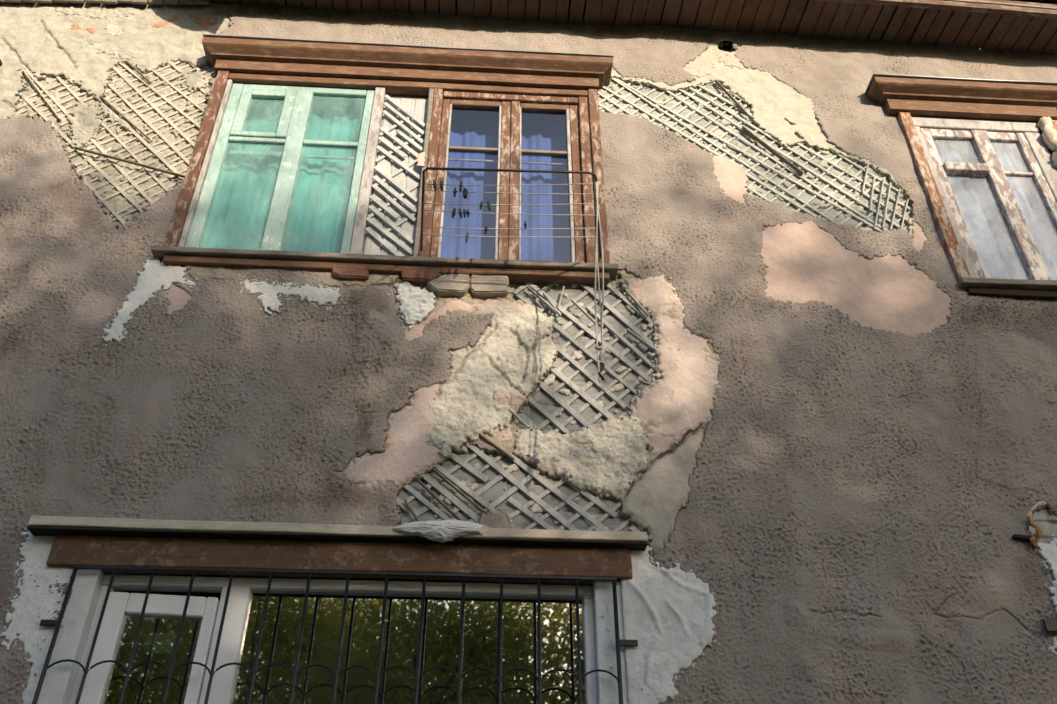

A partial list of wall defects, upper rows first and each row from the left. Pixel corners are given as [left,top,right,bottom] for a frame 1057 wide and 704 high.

flaking render [0,0,235,229]
flaking render [161,265,256,314]
flaking render [598,38,951,339]
flaking render [284,270,723,556]
crack [933,593,1029,632]
flaking render [1012,500,1057,549]